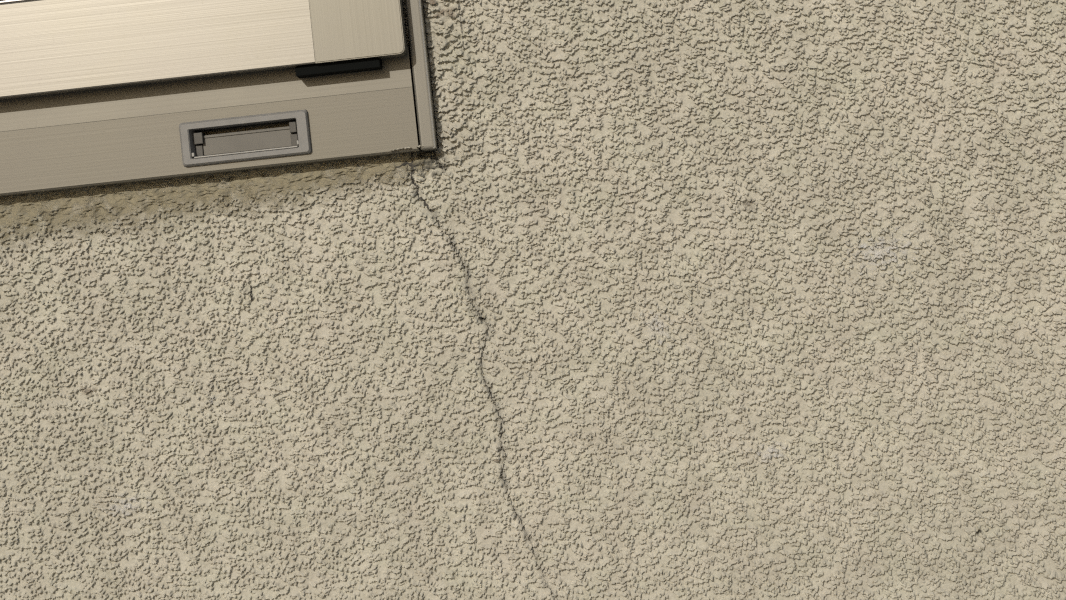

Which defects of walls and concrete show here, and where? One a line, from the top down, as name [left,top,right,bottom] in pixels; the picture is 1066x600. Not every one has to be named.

crack [395,151,553,594]